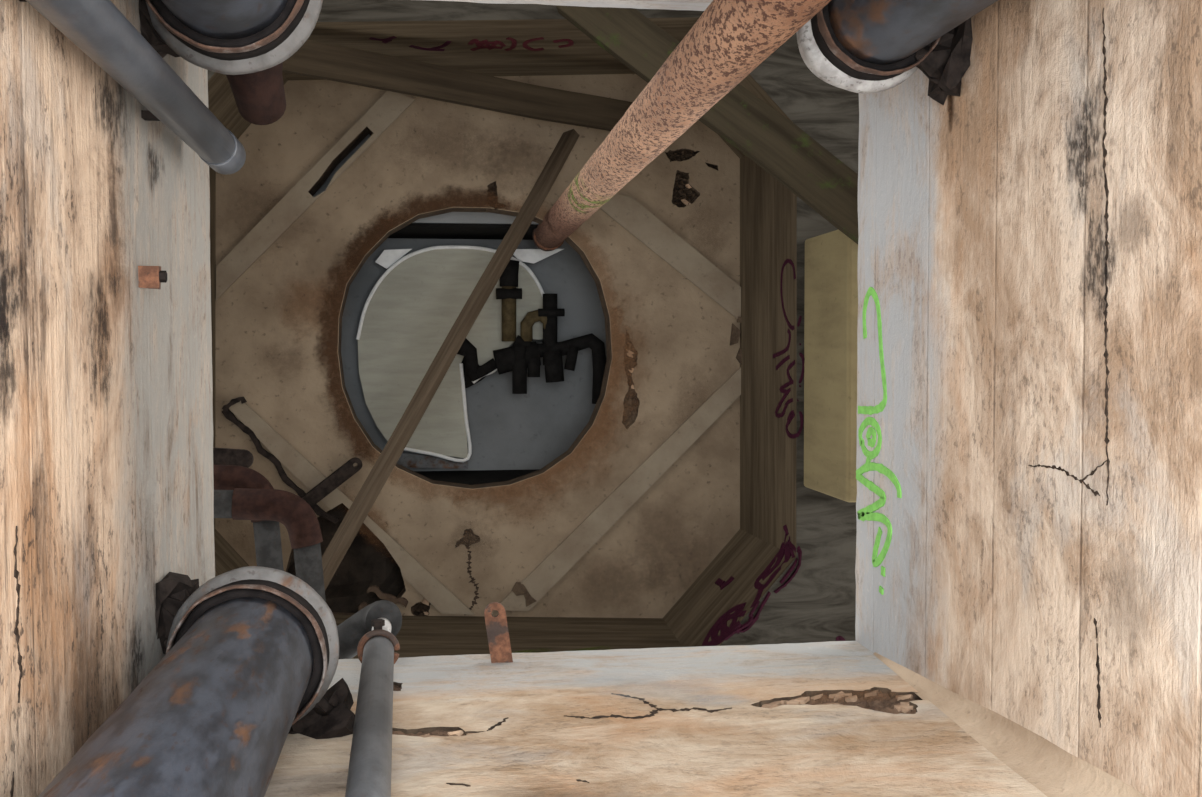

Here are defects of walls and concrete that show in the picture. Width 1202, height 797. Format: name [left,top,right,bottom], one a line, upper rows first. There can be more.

leakage [0,221,25,411]
rust [318,189,507,457]
crack [1028,8,1110,505]
leakage [1067,85,1114,318]
crack [8,771,16,797]
crack [13,526,22,703]
spalling [392,730,474,738]
crack [487,718,508,731]
crack [564,693,732,719]
spalling [762,690,919,714]